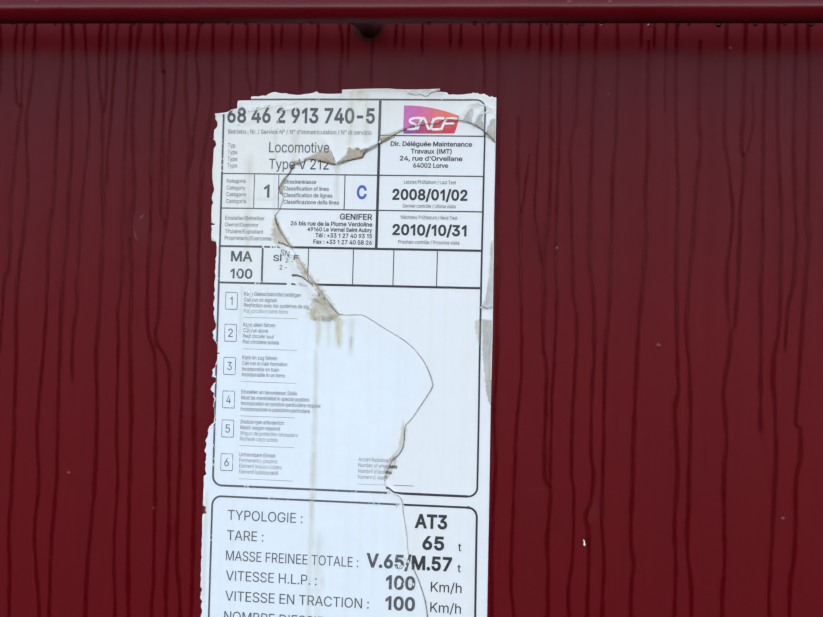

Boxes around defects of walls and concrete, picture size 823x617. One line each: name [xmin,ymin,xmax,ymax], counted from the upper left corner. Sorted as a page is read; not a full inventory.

damp [0,119,30,617]
damp [33,105,90,617]
damp [84,86,113,617]
damp [112,24,140,617]
damp [145,106,209,617]
damp [483,198,500,617]
damp [534,178,558,617]
damp [567,175,614,617]
damp [629,167,647,617]
damp [673,190,696,617]
damp [720,183,743,617]
damp [758,173,811,617]